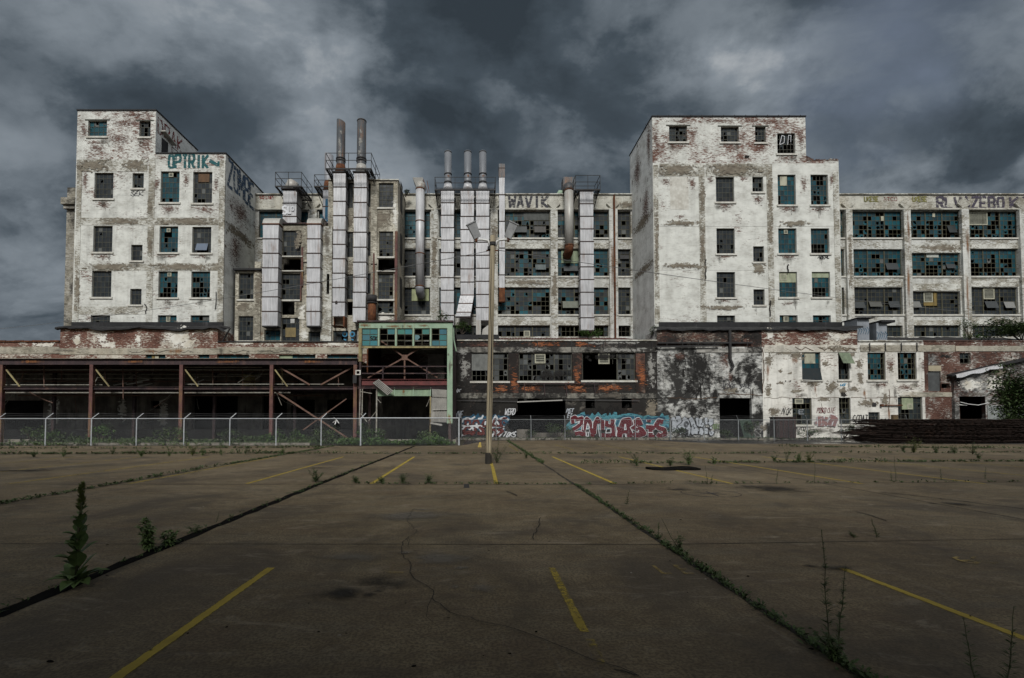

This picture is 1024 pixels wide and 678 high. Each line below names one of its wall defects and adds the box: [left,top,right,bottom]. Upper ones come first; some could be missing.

spalling [76,112,166,192]
spalling [75,177,255,311]
spalling [620,119,810,293]
spalling [700,300,745,310]
spalling [567,348,658,416]
crack [355,510,639,676]